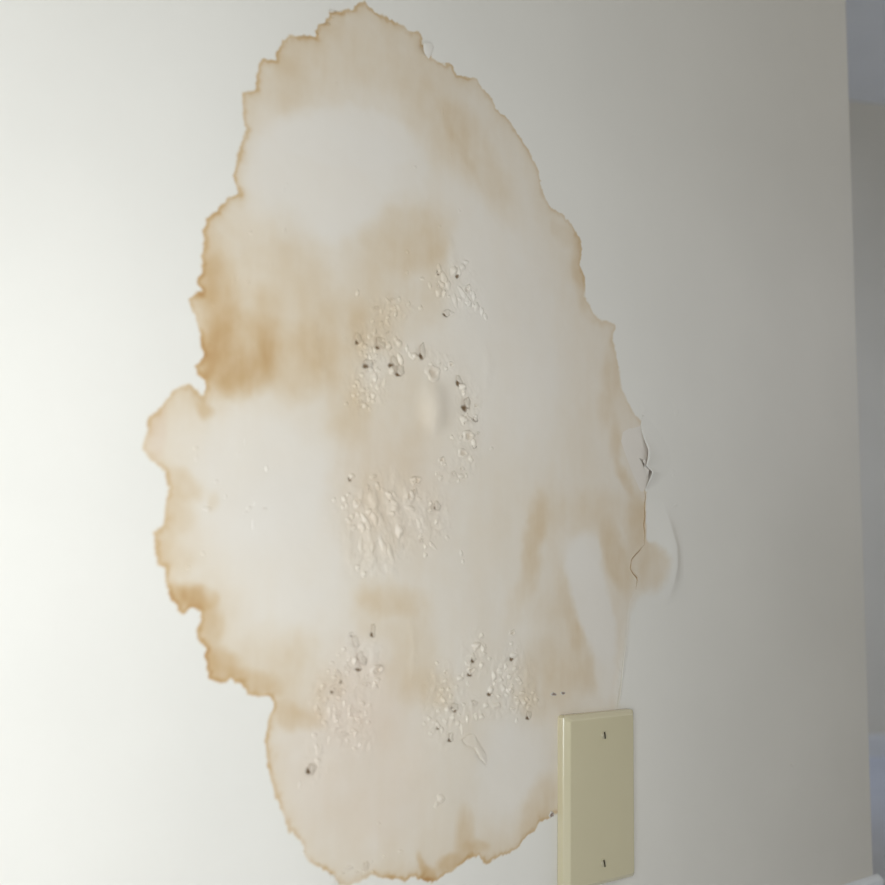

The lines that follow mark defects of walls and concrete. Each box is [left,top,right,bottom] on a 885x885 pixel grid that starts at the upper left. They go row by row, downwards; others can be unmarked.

water stain [139,0,665,885]